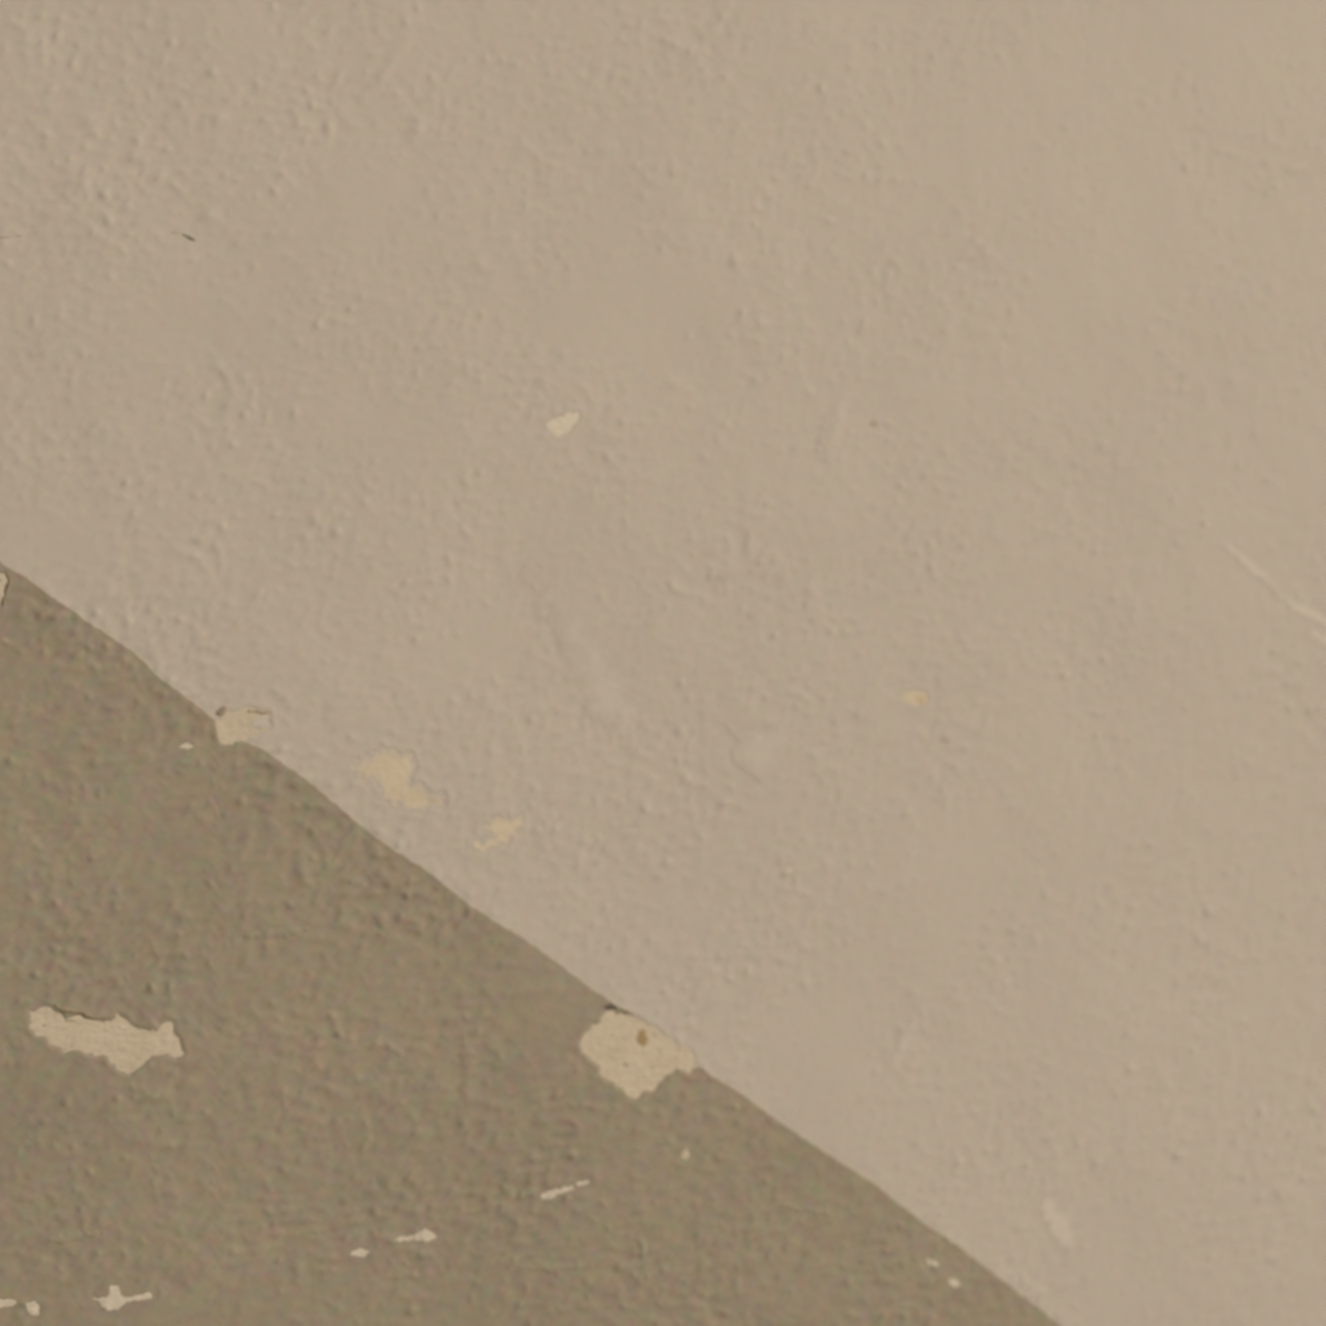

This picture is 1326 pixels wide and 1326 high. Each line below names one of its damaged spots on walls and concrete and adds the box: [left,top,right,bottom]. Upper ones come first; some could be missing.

peeling [215,706,272,745]
peeling [30,1004,184,1074]
peeling [580,1003,700,1099]
peeling [92,1285,152,1311]